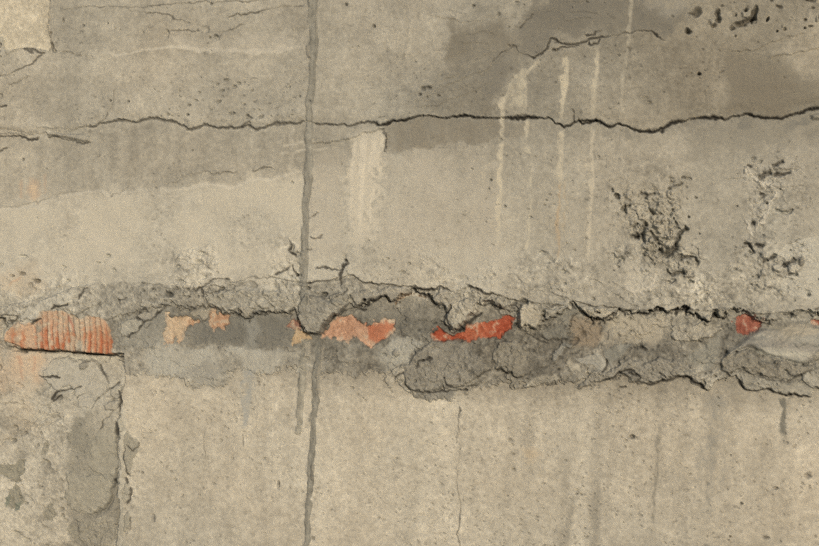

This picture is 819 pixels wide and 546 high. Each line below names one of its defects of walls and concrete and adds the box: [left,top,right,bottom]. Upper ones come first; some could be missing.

peeling [0,0,55,55]
crack [0,0,304,108]
damp [0,49,541,267]
crack [0,89,819,152]
damp [554,54,570,260]
crack [492,13,666,62]
damp [583,46,610,268]
spalling [612,176,703,283]
spalling [734,156,819,301]
crack [0,211,773,546]